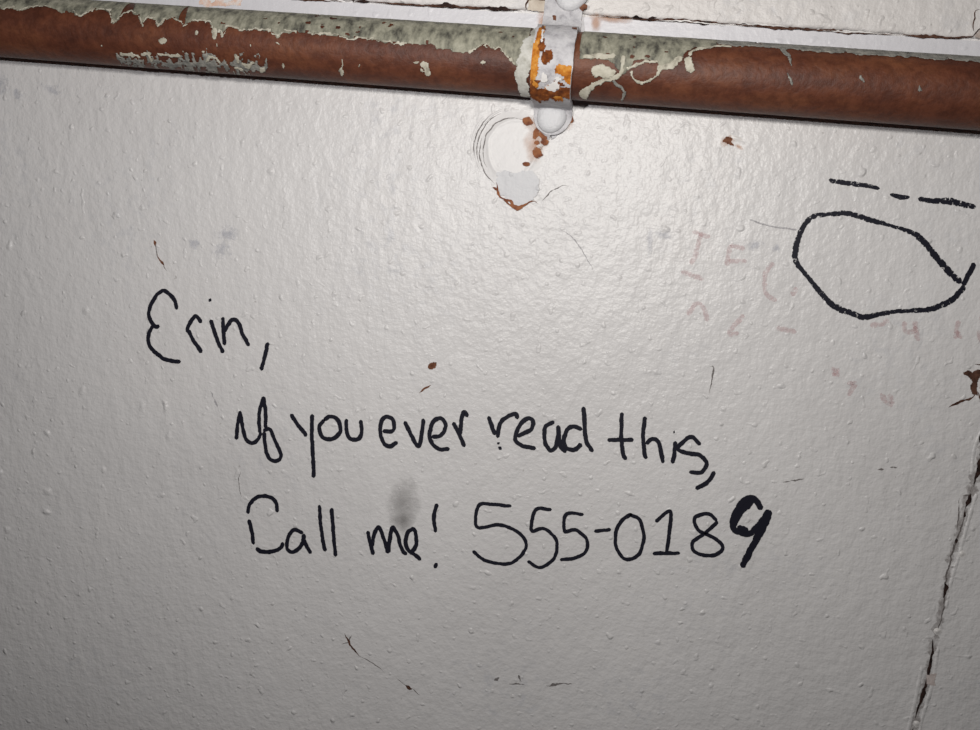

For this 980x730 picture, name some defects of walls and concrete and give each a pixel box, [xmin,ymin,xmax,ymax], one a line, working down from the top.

corrosion [530,15,572,103]
corrosion [522,117,549,166]
peeling [493,170,564,211]
spalling [949,364,980,407]
crack [906,431,980,730]